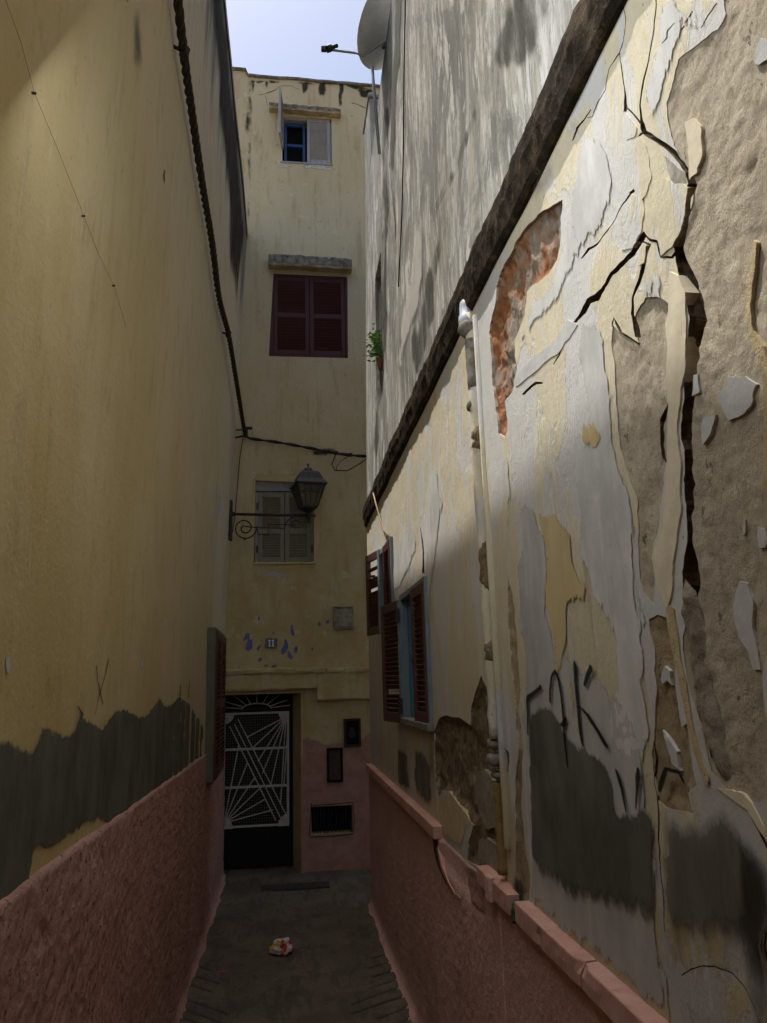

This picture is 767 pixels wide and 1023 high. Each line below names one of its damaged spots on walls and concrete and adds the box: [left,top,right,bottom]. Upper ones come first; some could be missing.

crack [625,97,697,187]
flaking render [491,135,611,436]
crack [578,234,707,348]
peeling [471,426,480,449]
peeling [582,421,600,448]
crack [660,380,696,511]
flaking render [612,0,767,814]
crack [688,545,700,596]
peeling [435,504,670,1022]
leakage [739,849,766,977]